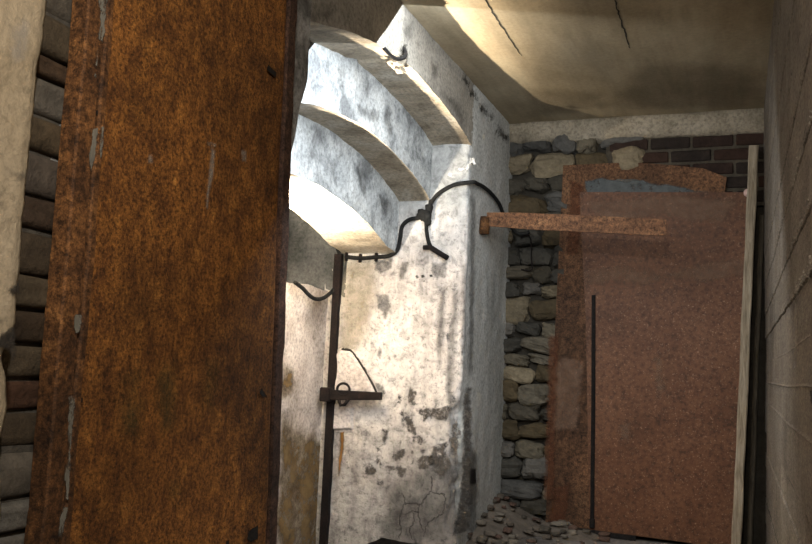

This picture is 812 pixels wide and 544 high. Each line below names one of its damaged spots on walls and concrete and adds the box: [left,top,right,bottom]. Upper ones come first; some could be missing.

crack [485,0,522,56]
crack [615,0,630,48]
peeling [365,387,476,535]
crack [398,477,446,539]